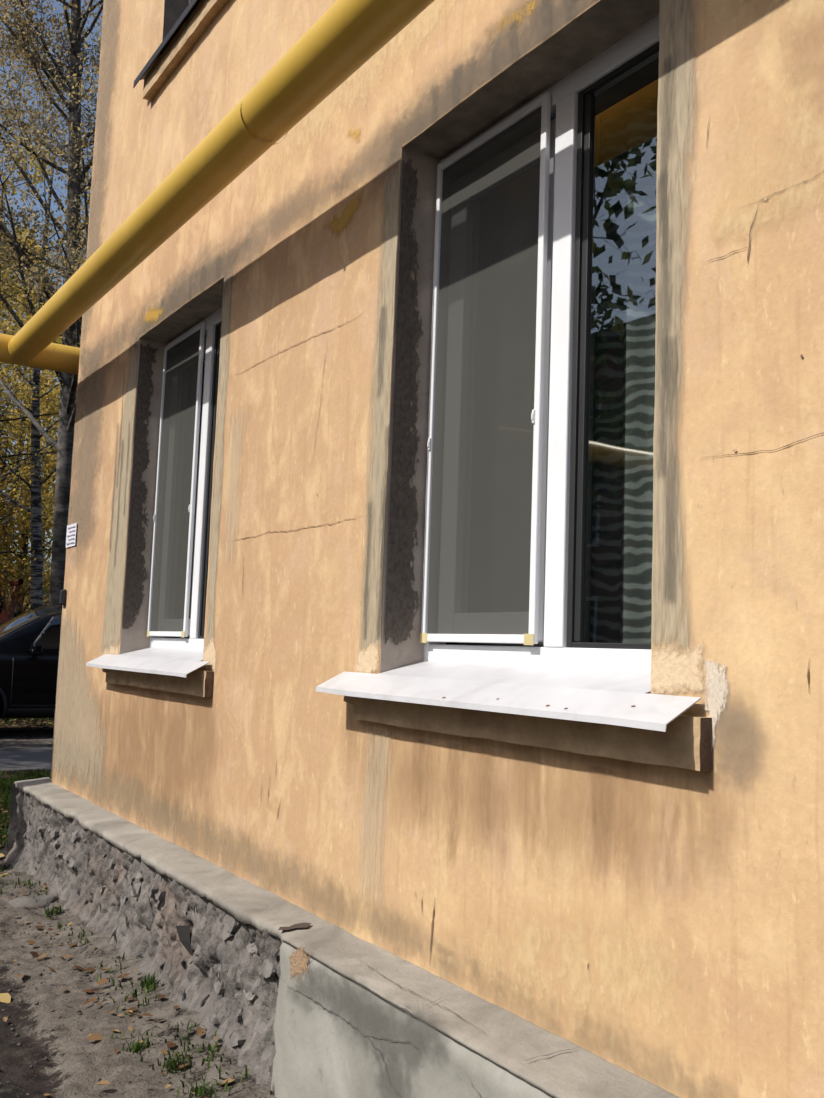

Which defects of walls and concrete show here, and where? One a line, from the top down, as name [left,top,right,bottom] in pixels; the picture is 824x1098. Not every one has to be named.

crack [707,171,824,263]
peeling [123,344,157,629]
crack [223,518,355,543]
crack [230,309,366,462]
peeling [385,159,423,645]
damp [334,0,586,650]
damp [651,0,695,651]
crack [712,433,823,457]
damp [717,709,755,766]
crack [274,950,418,1098]
crack [358,959,490,1037]